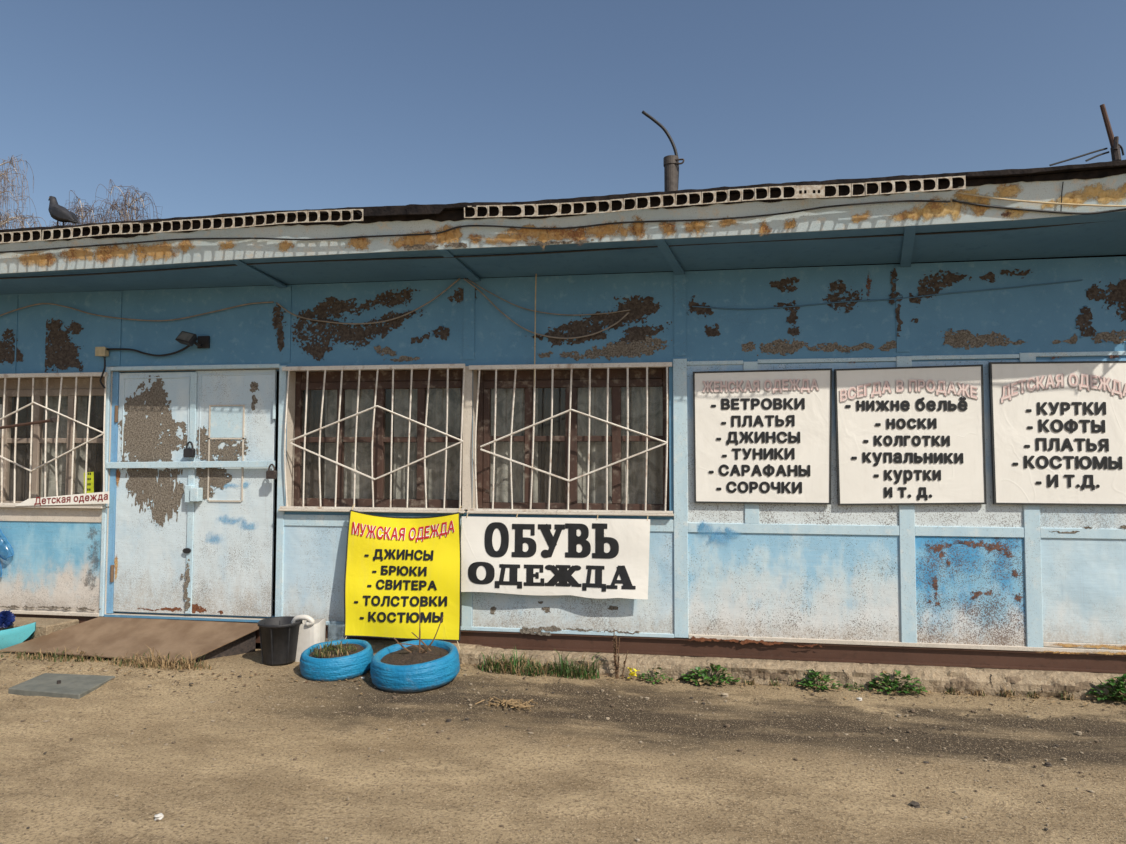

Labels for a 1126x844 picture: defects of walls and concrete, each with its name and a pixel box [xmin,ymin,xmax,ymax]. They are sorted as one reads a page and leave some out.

peeling [0,328,24,365]
peeling [44,318,84,373]
peeling [272,286,450,362]
peeling [532,295,672,361]
peeling [741,268,1032,356]
peeling [1052,278,1126,344]
peeling [118,375,250,527]
corrosion [926,537,1021,578]